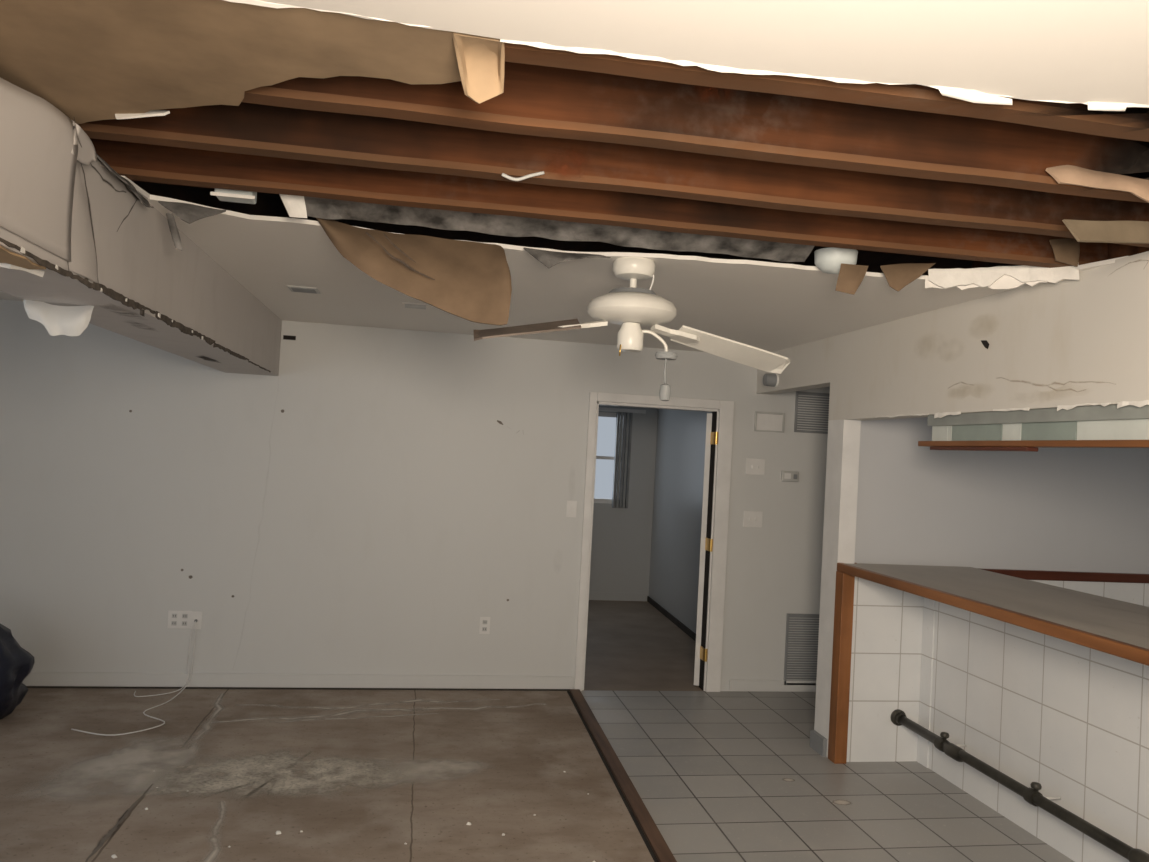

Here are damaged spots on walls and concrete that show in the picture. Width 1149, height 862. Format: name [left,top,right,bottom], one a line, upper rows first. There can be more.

peeling [0,0,1012,124]
peeling [1035,100,1149,111]
peeling [0,263,44,277]
peeling [1057,400,1149,411]